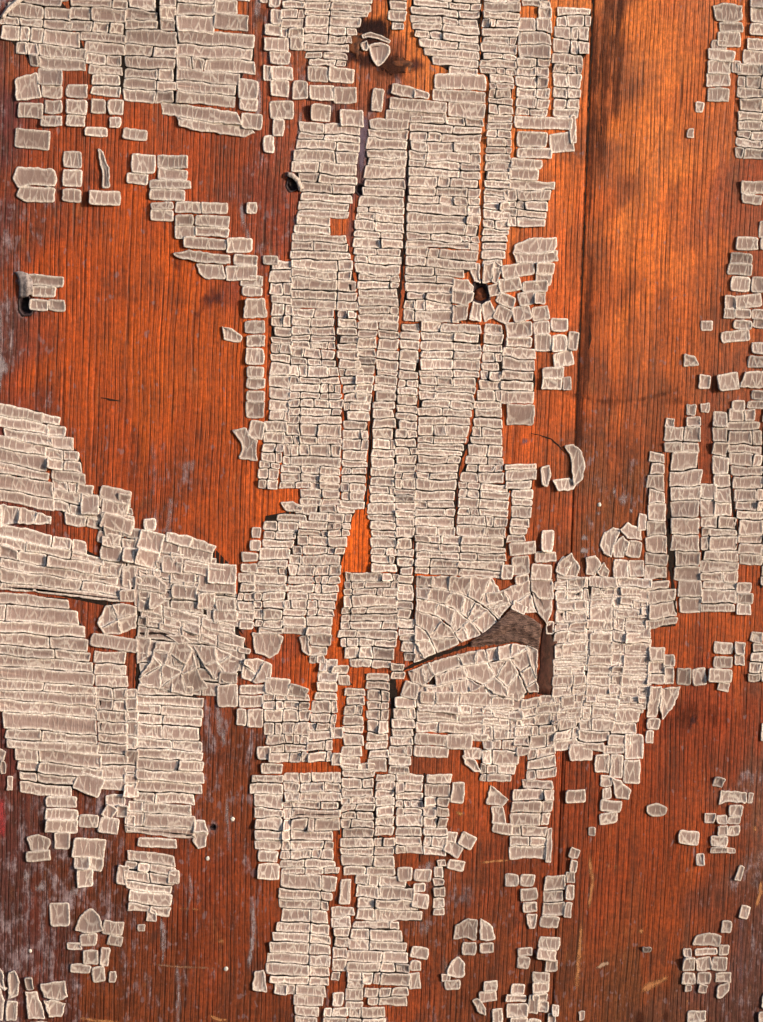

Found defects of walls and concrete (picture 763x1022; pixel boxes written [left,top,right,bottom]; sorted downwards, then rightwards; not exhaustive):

peeling [0,109,370,850]
peeling [249,0,680,1022]
peeling [663,371,763,615]
peeling [676,641,746,692]
peeling [748,632,763,682]
peeling [26,834,51,862]
peeling [71,838,106,888]
peeling [116,850,180,931]
peeling [678,777,754,866]
peeling [734,865,745,881]
peeling [681,905,751,999]
peeling [687,1010,706,1022]